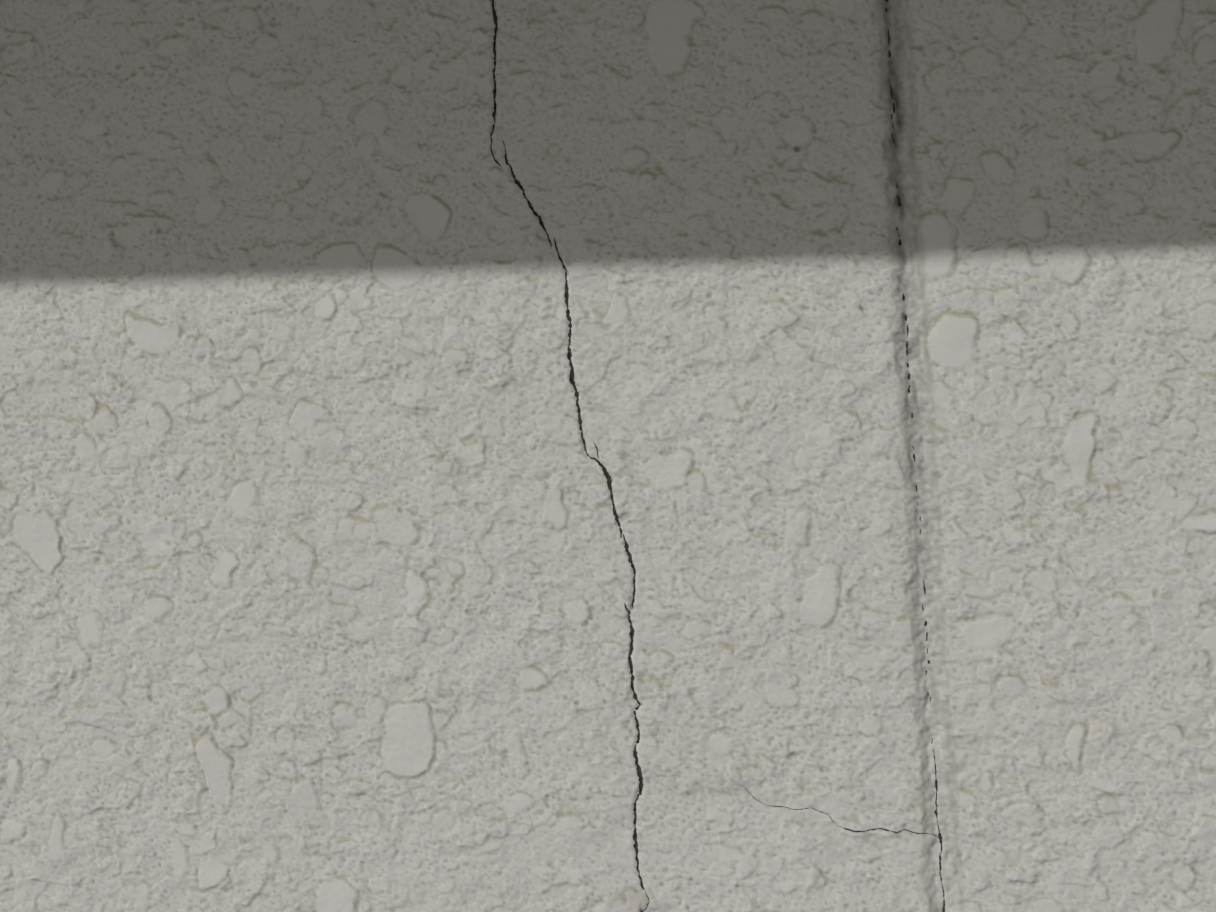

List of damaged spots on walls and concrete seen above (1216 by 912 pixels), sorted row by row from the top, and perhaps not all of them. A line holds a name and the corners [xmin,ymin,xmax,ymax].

crack [885,0,896,145]
crack [895,183,903,246]
crack [490,0,649,912]
crack [902,293,921,533]
crack [922,580,931,702]
crack [743,738,945,912]